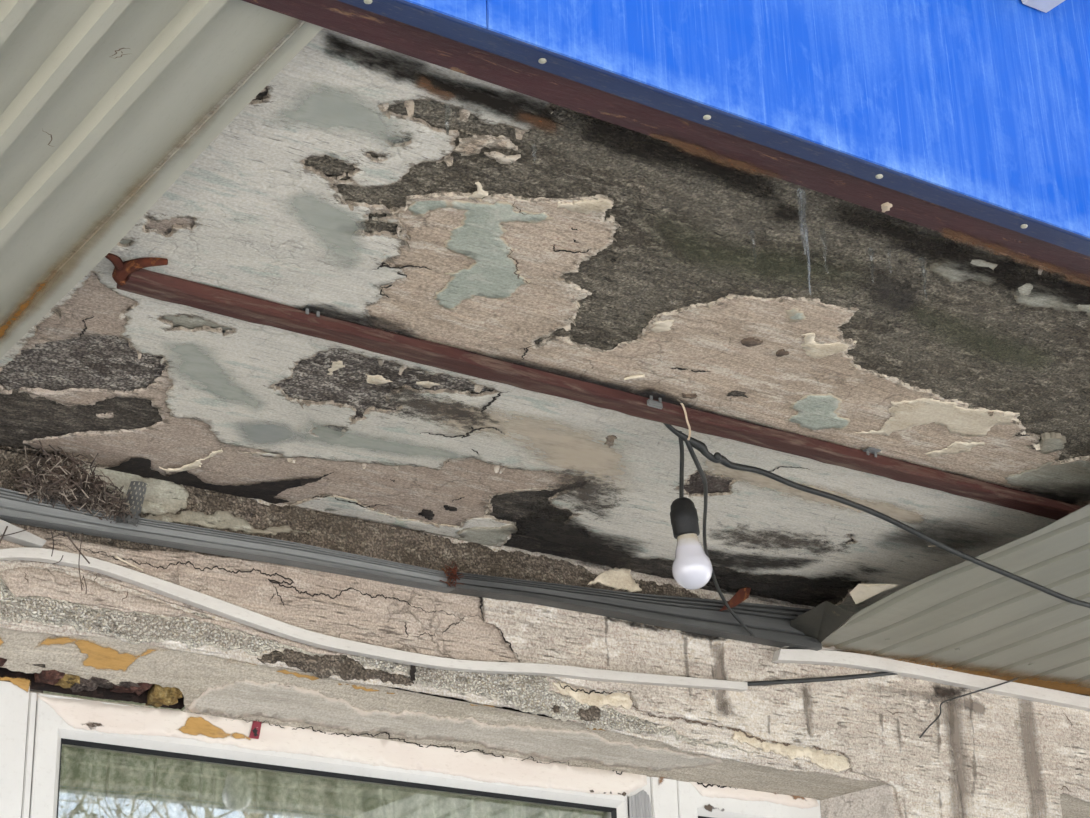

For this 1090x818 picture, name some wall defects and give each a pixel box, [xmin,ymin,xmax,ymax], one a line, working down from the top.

corrosion [651,134,779,176]
corrosion [0,213,118,341]
leakage [294,305,416,339]
spalling [271,100,1090,494]
corrosion [942,228,1090,286]
peeling [0,272,717,600]
crack [56,543,518,657]
leakage [512,509,642,569]
leakage [708,550,817,571]
crack [409,665,417,684]
spalling [0,578,851,772]
leakage [936,688,976,818]